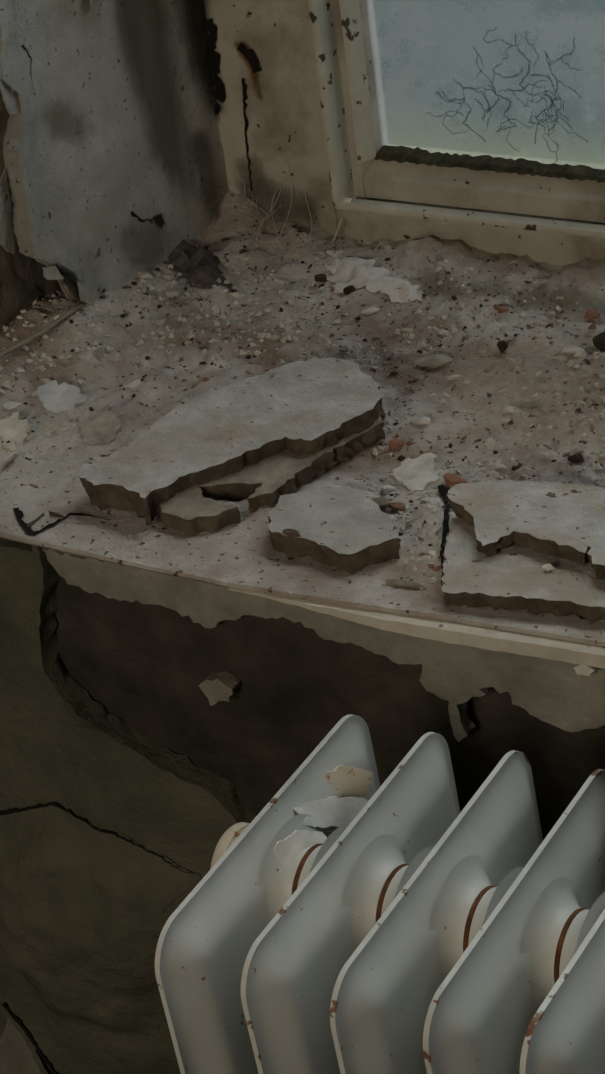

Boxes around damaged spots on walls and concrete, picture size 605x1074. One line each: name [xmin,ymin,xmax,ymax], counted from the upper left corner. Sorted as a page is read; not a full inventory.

flaking render [0,81,43,333]
flaking render [42,263,114,307]
flaking render [0,380,87,415]
flaking render [388,453,440,522]
flaking render [42,548,605,873]